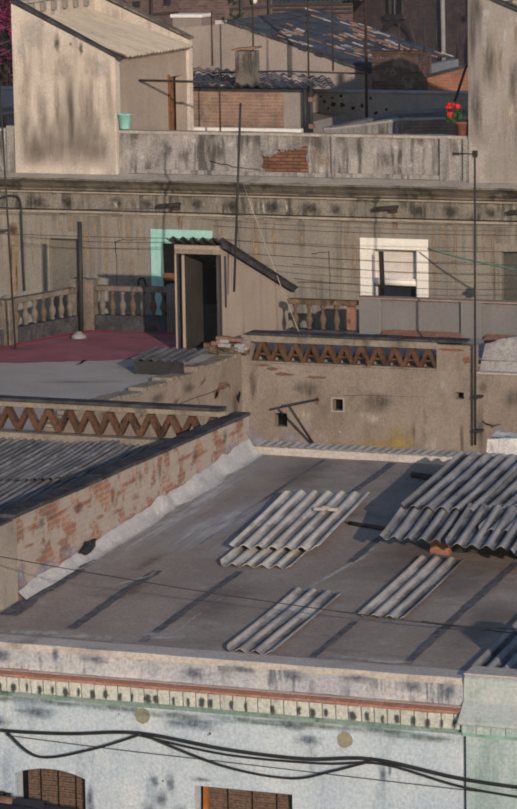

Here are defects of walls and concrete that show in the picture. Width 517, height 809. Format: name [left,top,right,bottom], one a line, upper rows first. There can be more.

flaking render [259,143,310,173]